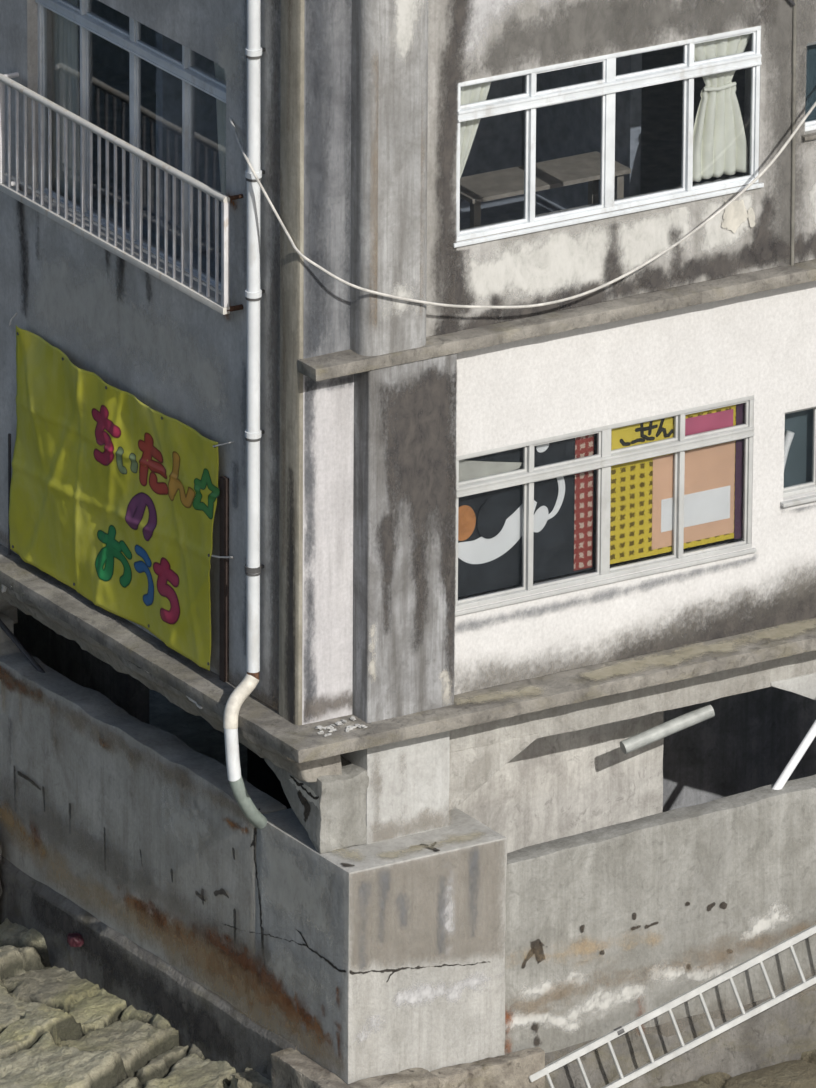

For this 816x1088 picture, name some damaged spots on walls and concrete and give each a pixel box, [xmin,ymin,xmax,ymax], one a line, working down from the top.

leakage [434,0,816,336]
leakage [252,0,353,724]
leakage [377,369,816,703]
corrosion [0,666,42,700]
spalling [289,778,319,822]
corrosion [123,895,340,1055]
crack [207,808,489,982]
spalling [522,939,547,968]